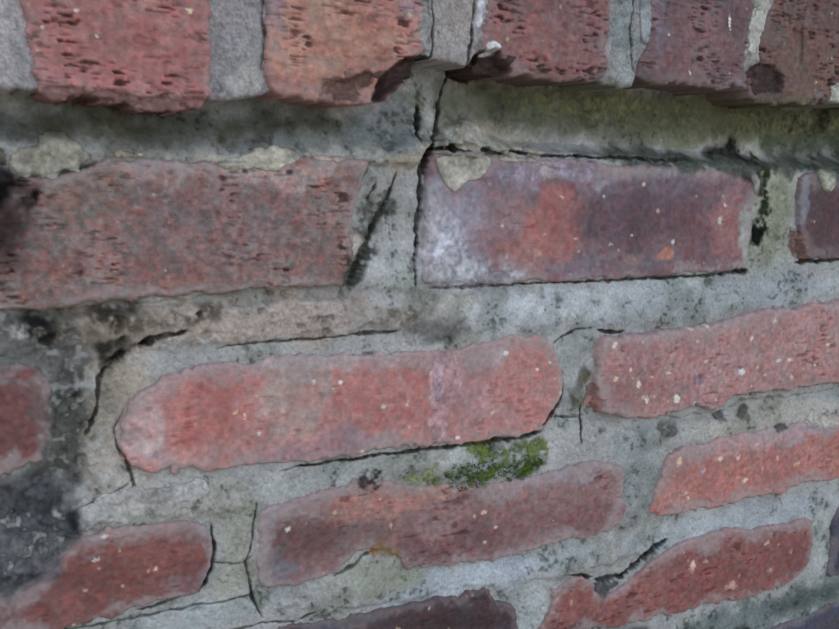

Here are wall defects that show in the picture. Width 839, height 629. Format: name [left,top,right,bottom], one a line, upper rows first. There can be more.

crack [427,1,435,59]
crack [467,12,478,70]
crack [411,77,746,289]
crack [348,173,397,278]
crack [227,330,397,346]
crack [85,330,188,433]
crack [114,412,133,489]
crack [569,538,666,581]